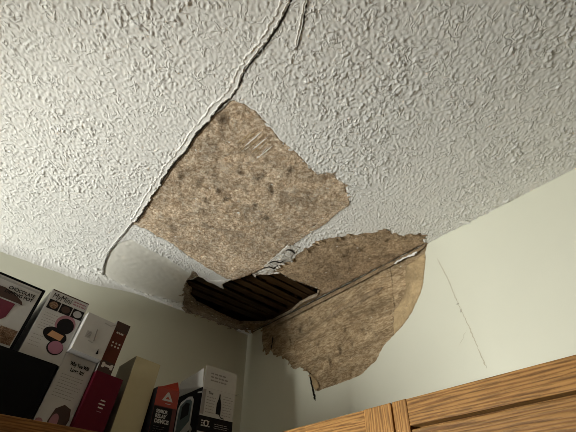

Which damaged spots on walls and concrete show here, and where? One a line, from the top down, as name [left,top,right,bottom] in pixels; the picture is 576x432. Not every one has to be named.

crack [102,0,307,275]
peeling [91,100,428,391]
crack [439,262,487,368]